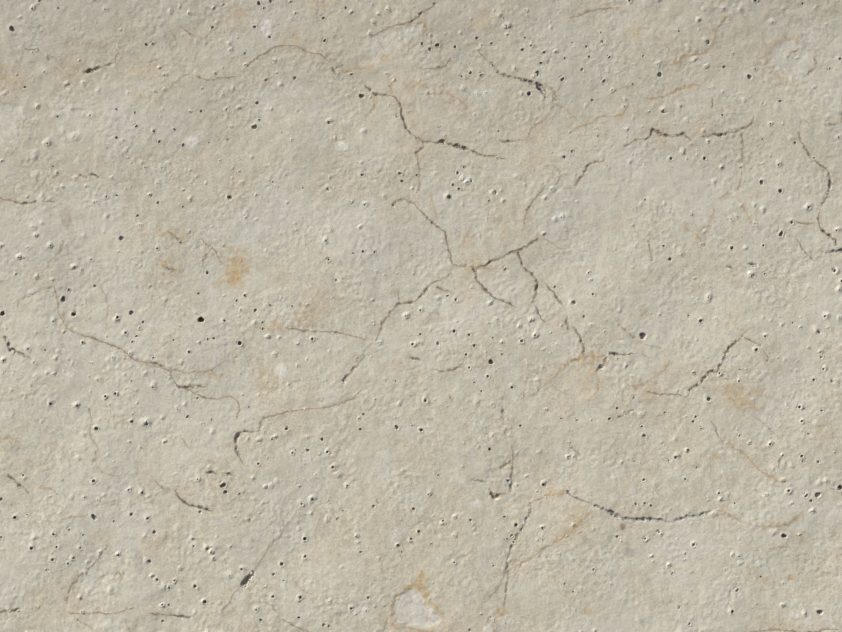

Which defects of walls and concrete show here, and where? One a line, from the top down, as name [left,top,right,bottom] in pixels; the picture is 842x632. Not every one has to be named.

crack [363,0,441,56]
crack [787,90,842,266]
crack [0,13,781,484]
crack [58,539,195,632]
crack [139,475,220,518]
crack [220,513,316,632]
crack [372,613,445,632]
crack [466,439,810,612]